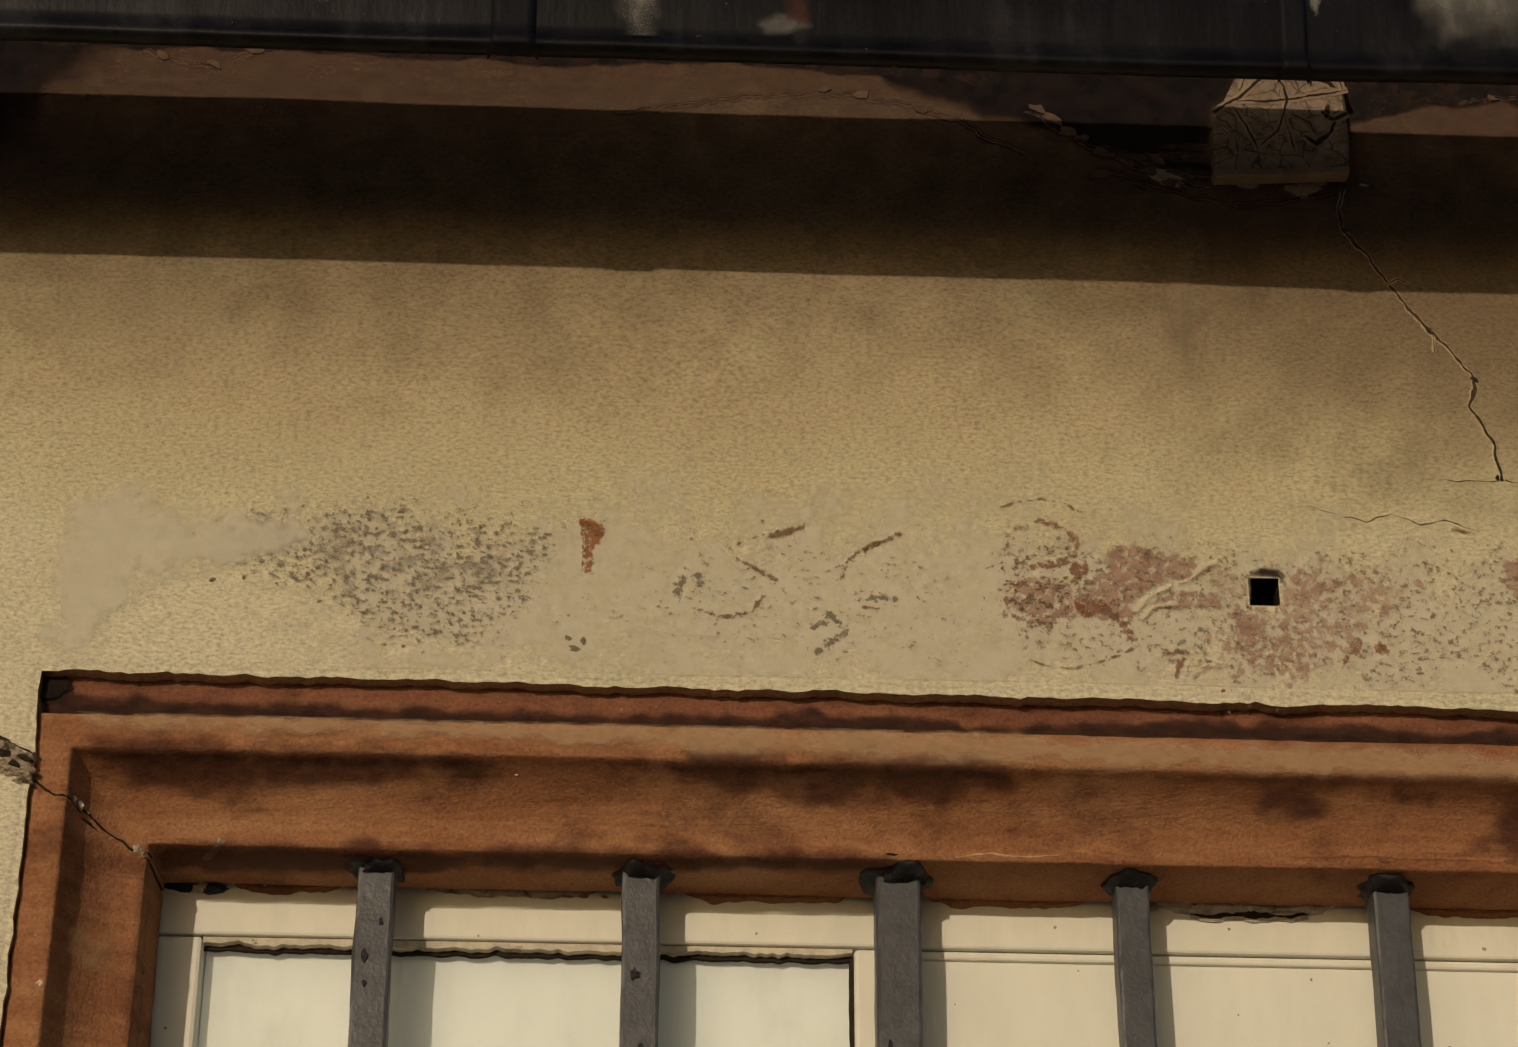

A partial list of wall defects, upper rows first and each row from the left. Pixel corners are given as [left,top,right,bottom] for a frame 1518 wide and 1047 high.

damp [0,41,1234,195]
peeling [1024,104,1205,196]
damp [1320,94,1518,203]
crack [1308,187,1518,535]
peeling [555,593,595,652]
peeling [641,519,970,660]
peeling [984,532,1518,694]
spalling [0,733,37,785]
crack [32,774,152,863]
damp [670,748,1011,803]
damp [1498,794,1518,856]